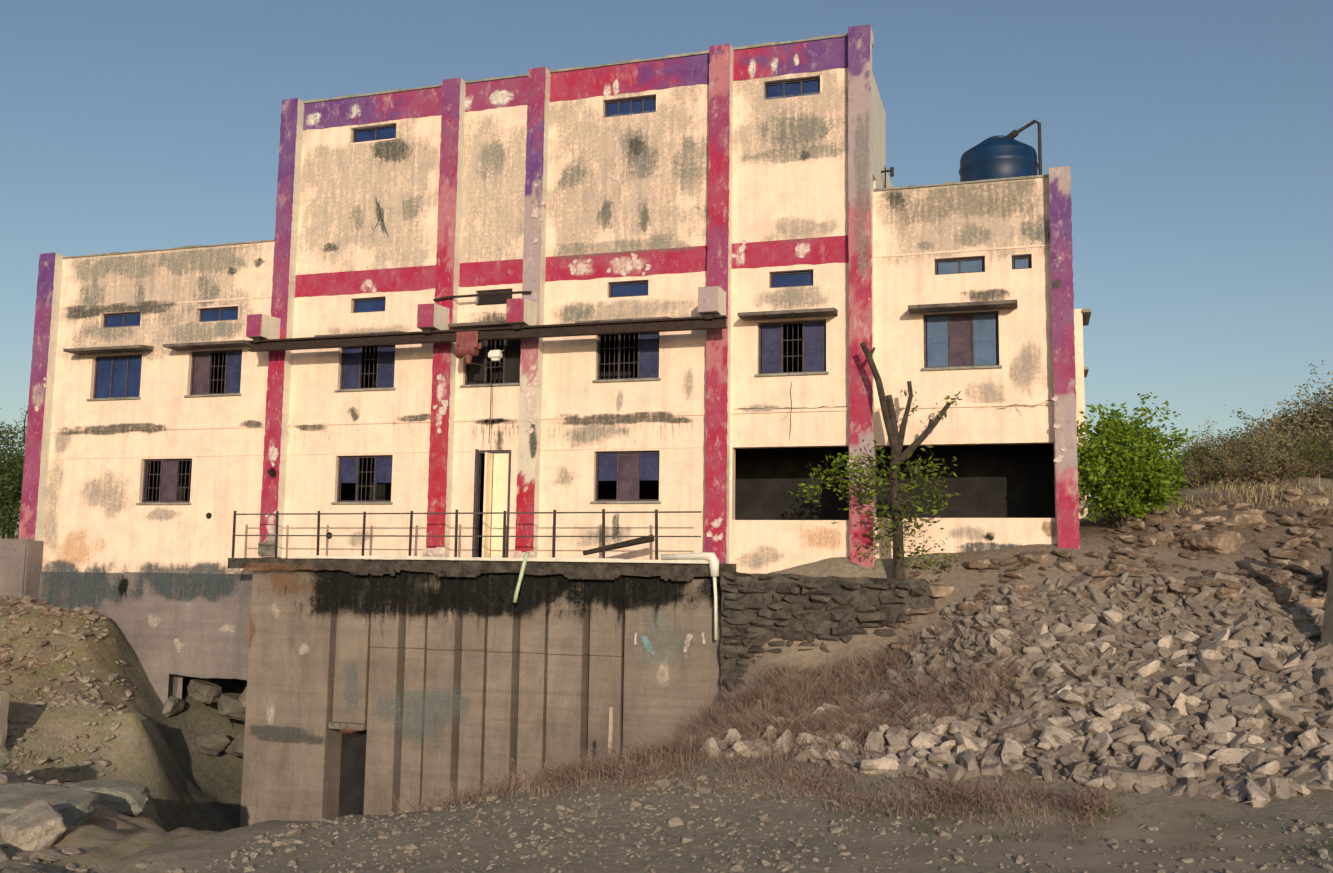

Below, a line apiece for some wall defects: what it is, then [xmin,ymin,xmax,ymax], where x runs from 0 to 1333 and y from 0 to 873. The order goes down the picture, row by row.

water stain [373,139,408,162]
water stain [628,134,658,175]
water stain [778,118,825,160]
water stain [376,204,384,231]
water stain [598,202,612,227]
water stain [640,205,648,231]
peeling [570,253,651,276]
water stain [67,283,174,318]
peeling [433,373,448,434]
water stain [564,411,690,442]
water stain [42,536,242,609]
water stain [311,558,722,619]